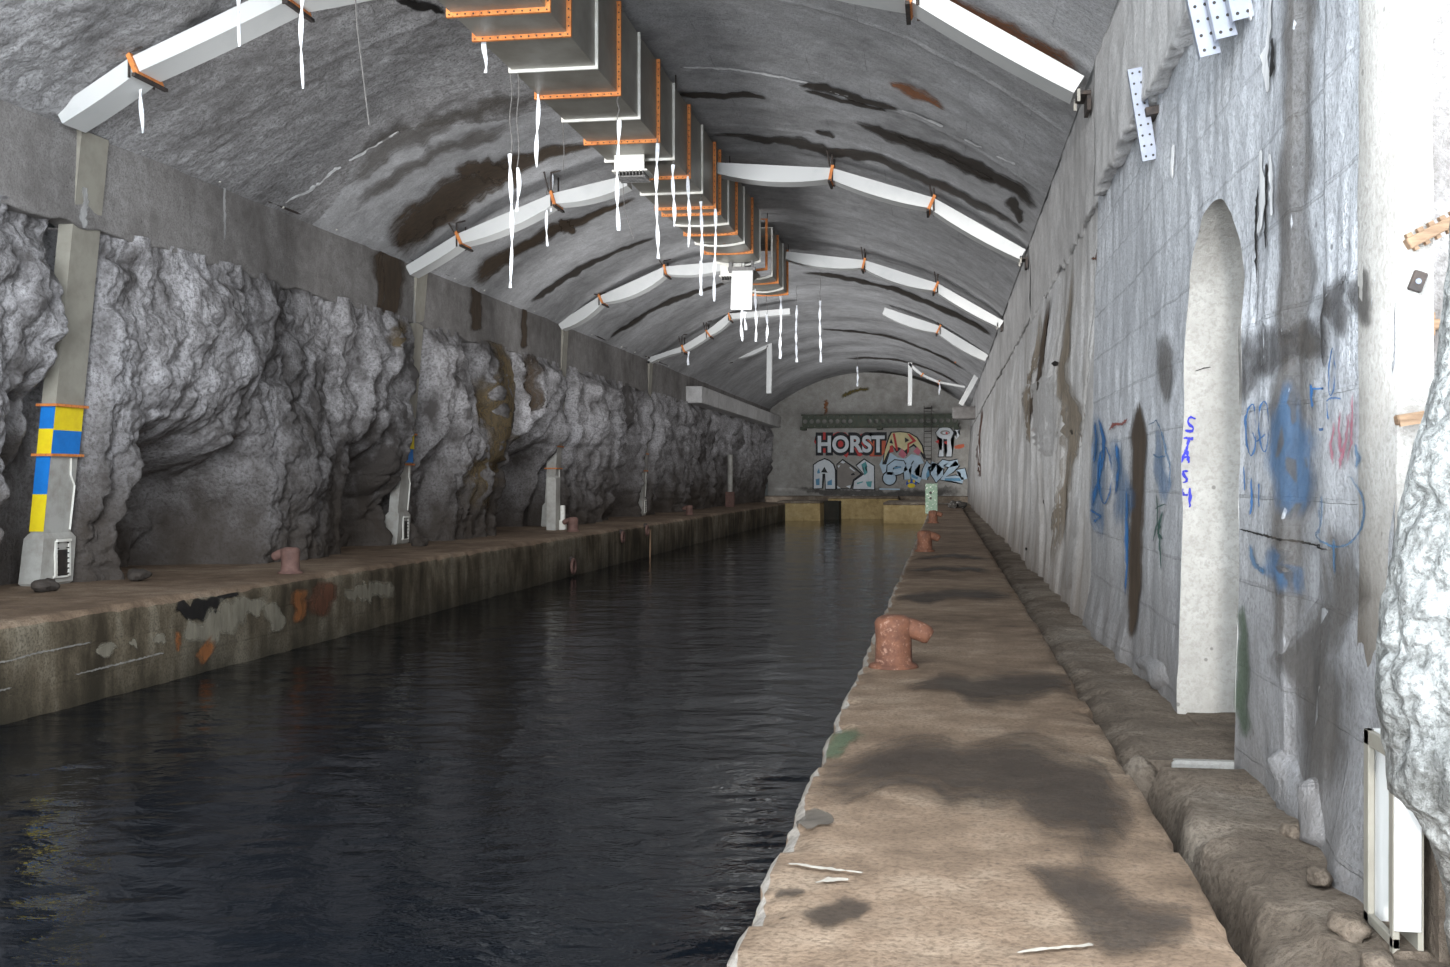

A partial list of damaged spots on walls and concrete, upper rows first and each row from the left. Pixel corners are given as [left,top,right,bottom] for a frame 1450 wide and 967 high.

damp [357,97,590,323]
damp [716,83,1034,230]
corrosion [891,83,942,109]
damp [1128,404,1146,636]
corrosion [293,582,337,621]